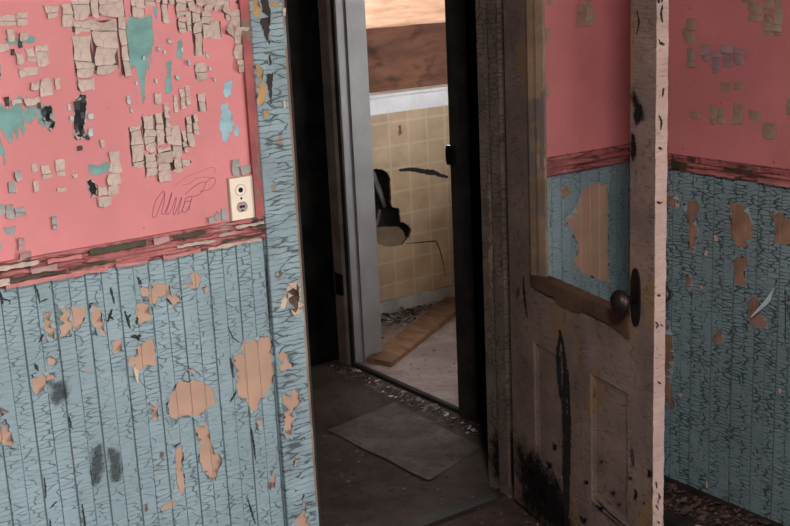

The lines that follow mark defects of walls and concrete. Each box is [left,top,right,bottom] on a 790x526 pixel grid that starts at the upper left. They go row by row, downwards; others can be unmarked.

peeling [0,12,60,132]
peeling [31,0,251,208]
spalling [252,0,286,120]
peeling [43,302,158,383]
crack [107,287,141,341]
peeling [0,203,264,290]
peeling [148,365,224,482]
crack [228,327,239,402]
crack [249,428,257,460]
peeling [232,334,301,440]
crack [263,255,271,321]
peeling [565,181,611,283]